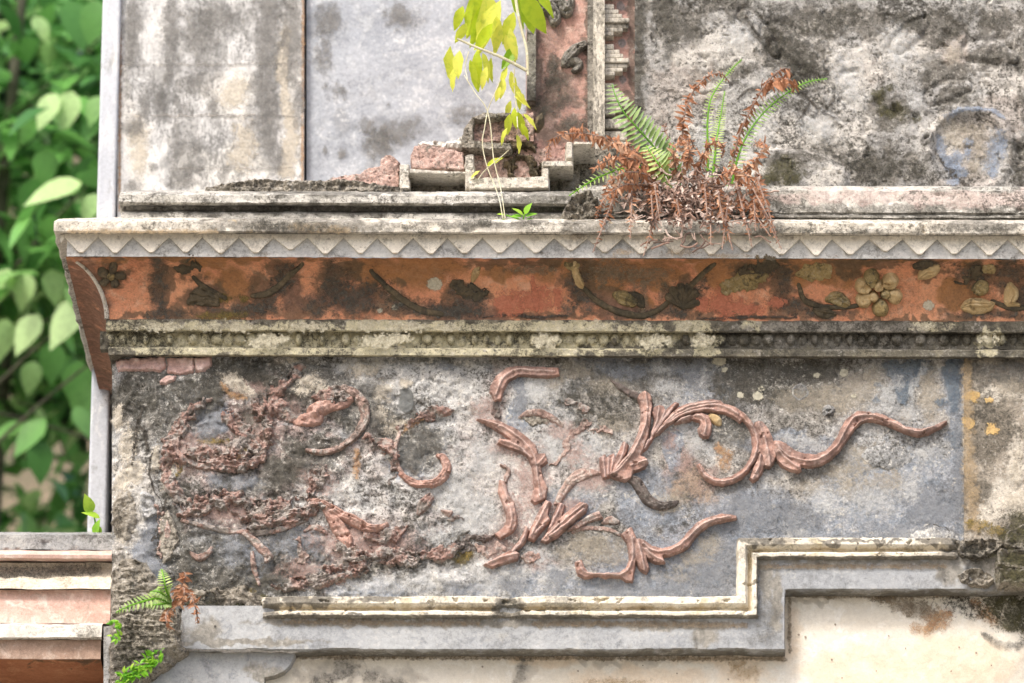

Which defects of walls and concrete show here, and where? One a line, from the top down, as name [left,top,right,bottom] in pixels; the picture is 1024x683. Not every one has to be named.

water stain [122,0,346,191]
water stain [383,3,411,30]
spalling [461,113,512,162]
water stain [633,0,705,148]
water stain [724,2,869,106]
water stain [800,114,929,183]
water stain [882,4,1011,88]
spalling [116,357,464,522]
flaking render [216,521,323,579]